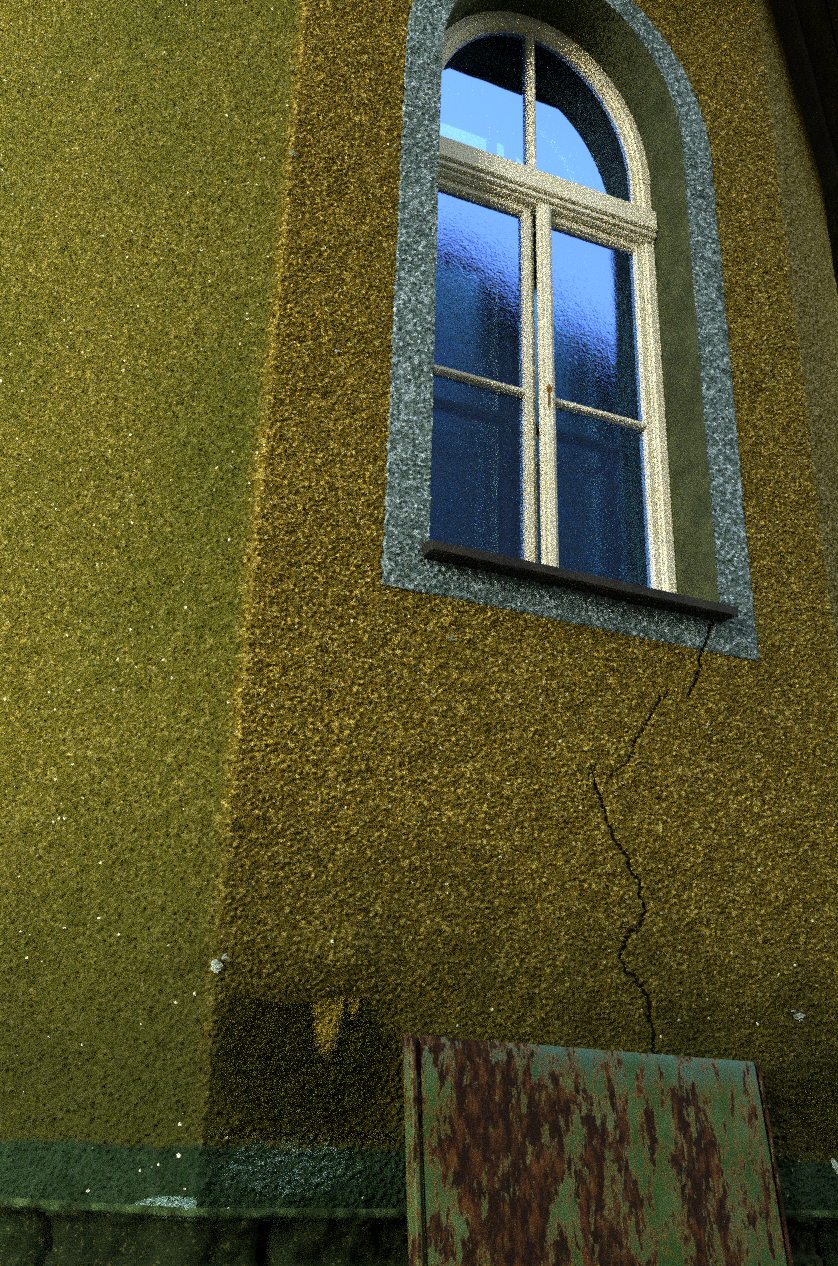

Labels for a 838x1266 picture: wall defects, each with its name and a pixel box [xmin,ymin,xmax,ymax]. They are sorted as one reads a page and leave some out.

crack [587,621,714,1054]